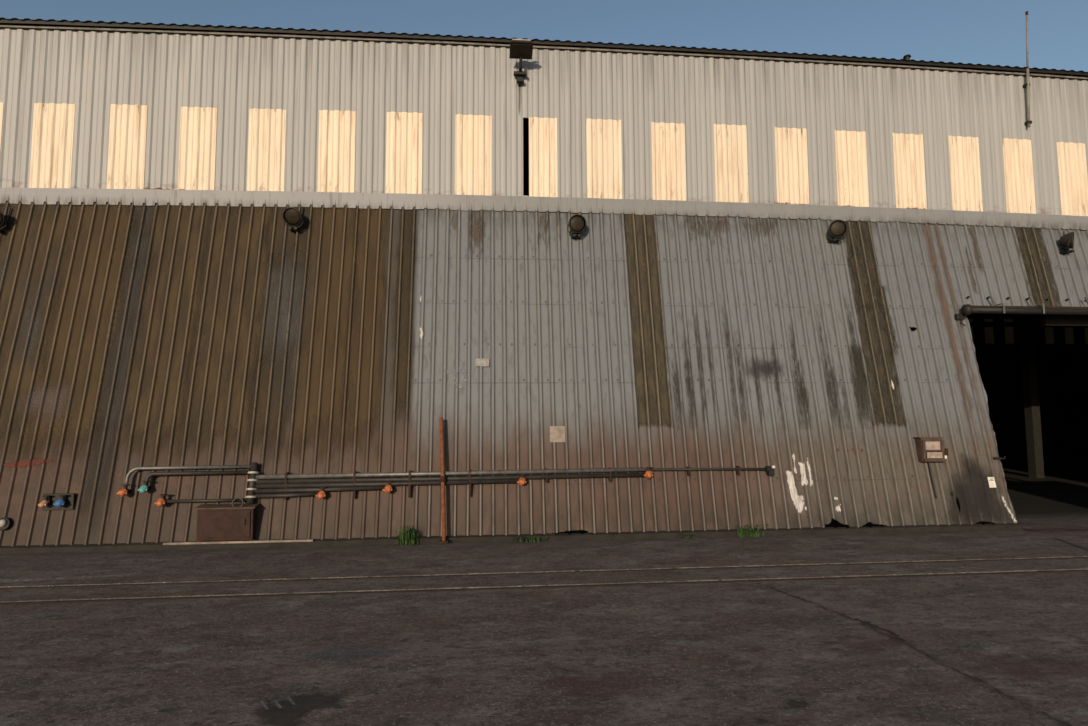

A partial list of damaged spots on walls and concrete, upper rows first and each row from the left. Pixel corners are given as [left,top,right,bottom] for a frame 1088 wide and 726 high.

leakage [673,327,713,414]
leakage [725,331,760,420]
leakage [791,340,809,419]
leakage [255,695,338,726]